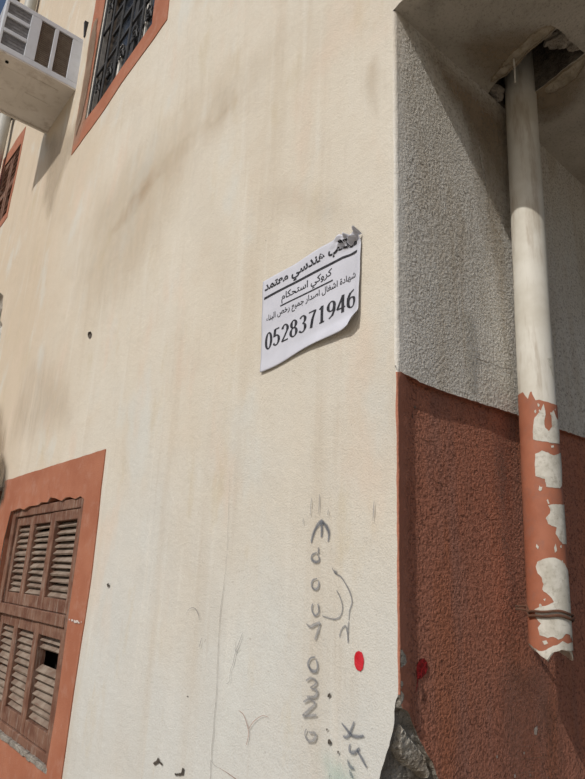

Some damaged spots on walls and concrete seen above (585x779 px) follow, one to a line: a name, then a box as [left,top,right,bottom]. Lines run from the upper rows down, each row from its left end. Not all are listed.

spalling [488,25,585,108]
spalling [379,681,438,779]